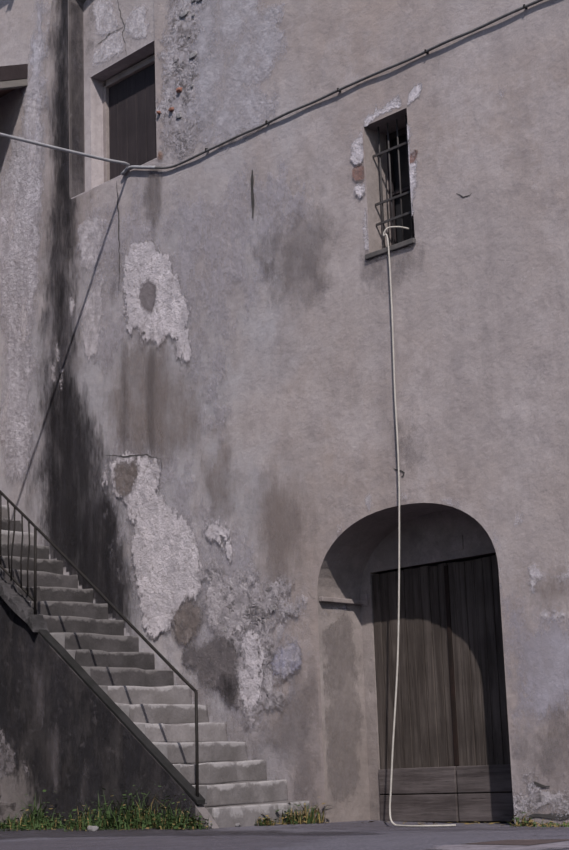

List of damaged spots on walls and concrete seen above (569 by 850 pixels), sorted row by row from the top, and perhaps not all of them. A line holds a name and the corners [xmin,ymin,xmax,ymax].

peeling [92,0,149,66]
peeling [155,0,286,165]
flaking render [350,82,422,198]
flaking render [407,123,418,215]
water stain [39,0,133,628]
peeling [122,239,194,364]
peeling [101,450,304,728]
peeling [0,729,29,779]
water stain [0,596,196,828]